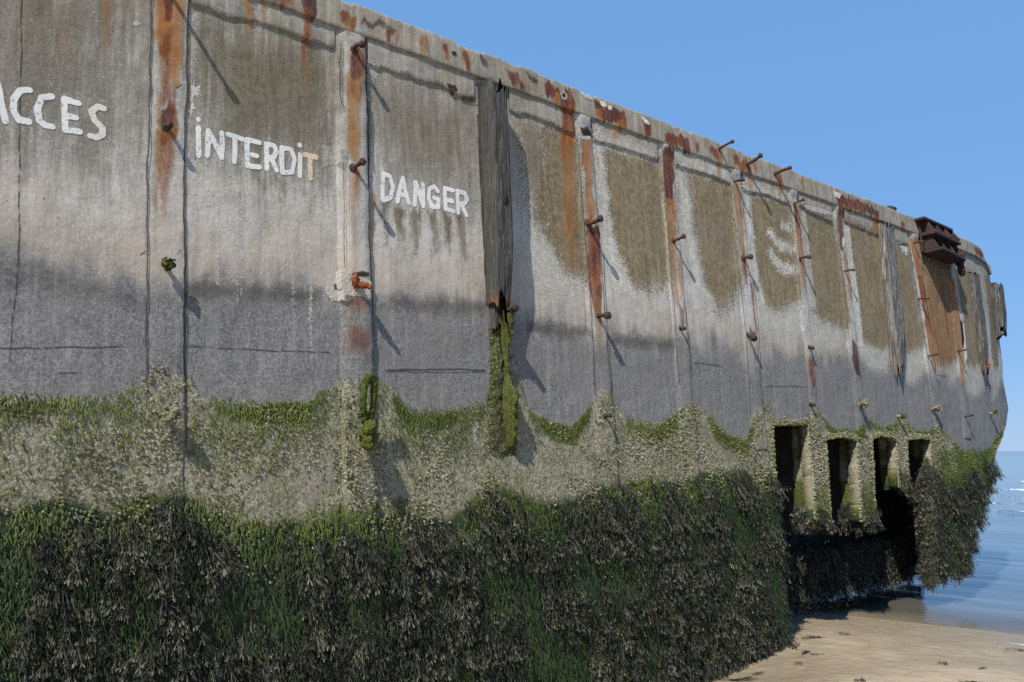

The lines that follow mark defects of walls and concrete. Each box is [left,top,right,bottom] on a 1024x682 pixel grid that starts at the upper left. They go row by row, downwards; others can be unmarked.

rust [155,0,184,192]
rust [280,0,317,63]
rust [347,47,366,159]
rust [507,70,627,314]
water stain [508,111,891,377]
rust [663,131,757,335]
rust [837,195,879,299]
rust [901,221,936,371]
rust [949,277,965,384]